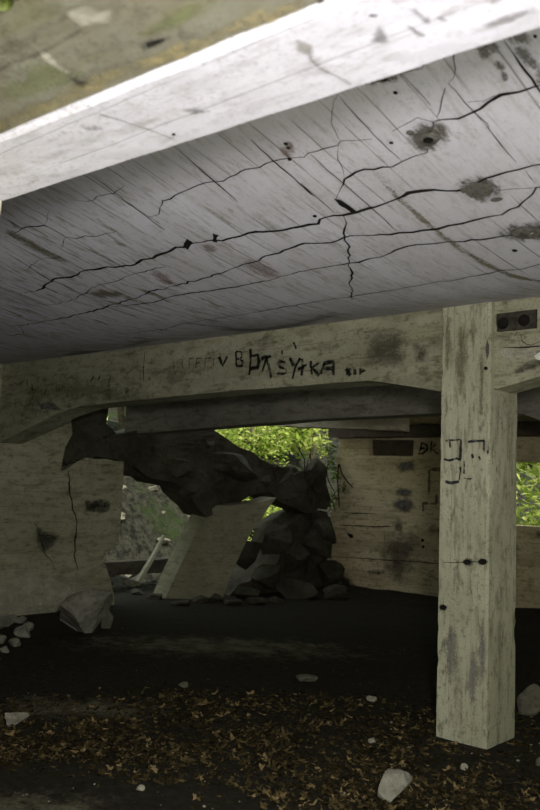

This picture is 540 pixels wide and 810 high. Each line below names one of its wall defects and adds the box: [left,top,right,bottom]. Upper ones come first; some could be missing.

damp [477,43,508,81]
damp [508,32,540,84]
crack [7,40,540,337]
damp [393,191,540,282]
crack [504,331,540,348]
crack [62,459,90,569]